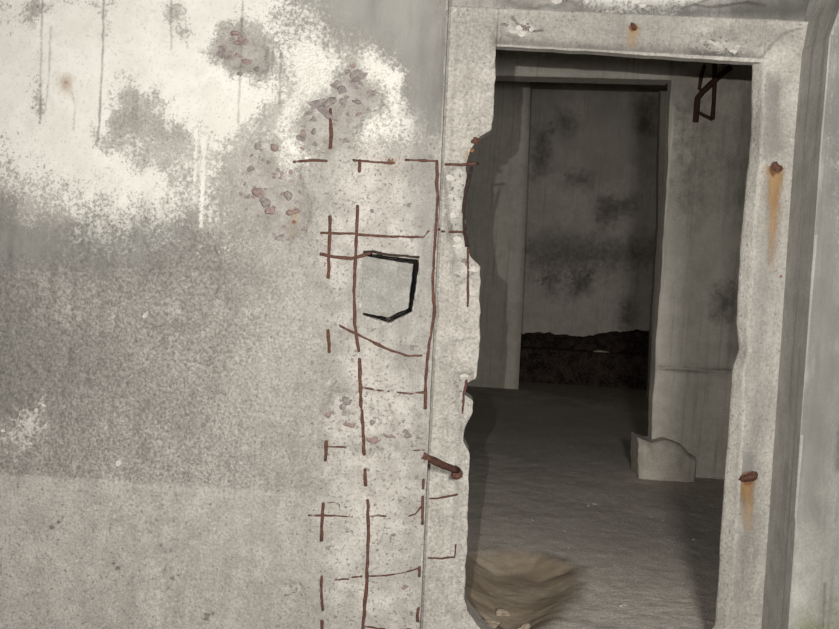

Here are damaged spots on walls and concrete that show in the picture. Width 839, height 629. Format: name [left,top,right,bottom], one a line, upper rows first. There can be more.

peeling [497,0,703,40]
rust [769,165,781,242]
peeling [0,0,479,629]
spalling [465,550,581,629]